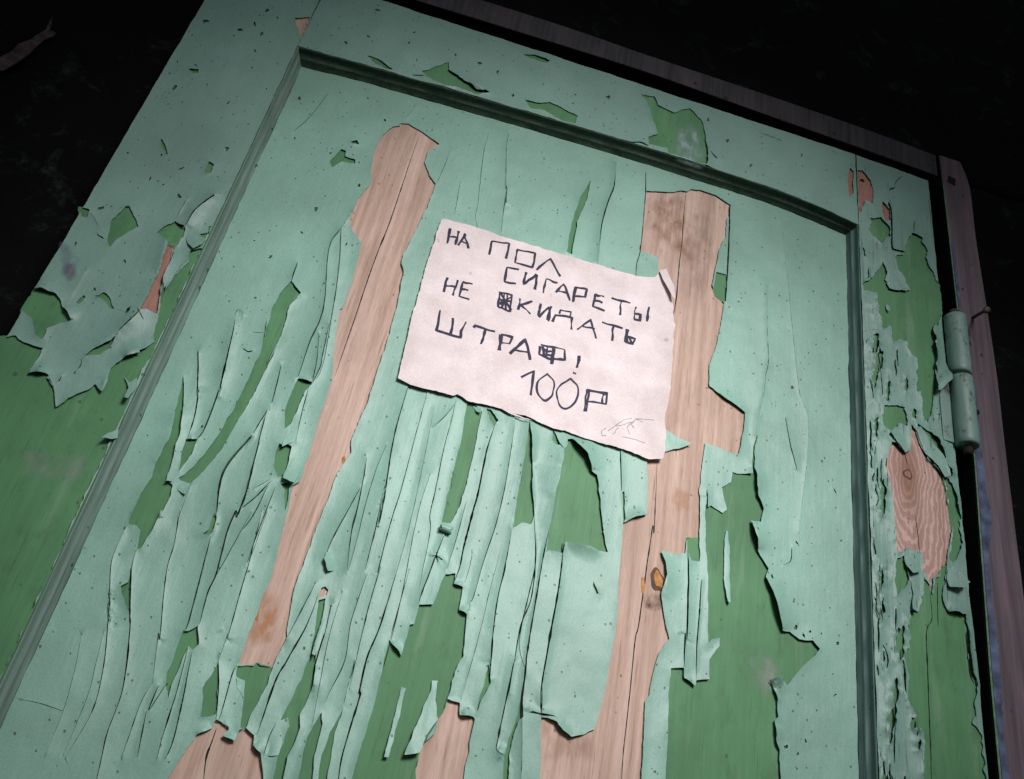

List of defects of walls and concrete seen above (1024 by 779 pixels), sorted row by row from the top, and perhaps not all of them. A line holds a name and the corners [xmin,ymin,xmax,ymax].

peeling [108,207,138,246]
peeling [642,95,709,166]
peeling [847,169,890,243]
peeling [0,221,214,682]
peeling [129,282,300,549]
peeling [166,120,439,779]
peeling [439,402,498,534]
peeling [513,421,534,528]
peeling [540,181,822,779]
peeling [860,234,986,779]
peeling [352,574,491,779]
peeling [502,698,523,779]